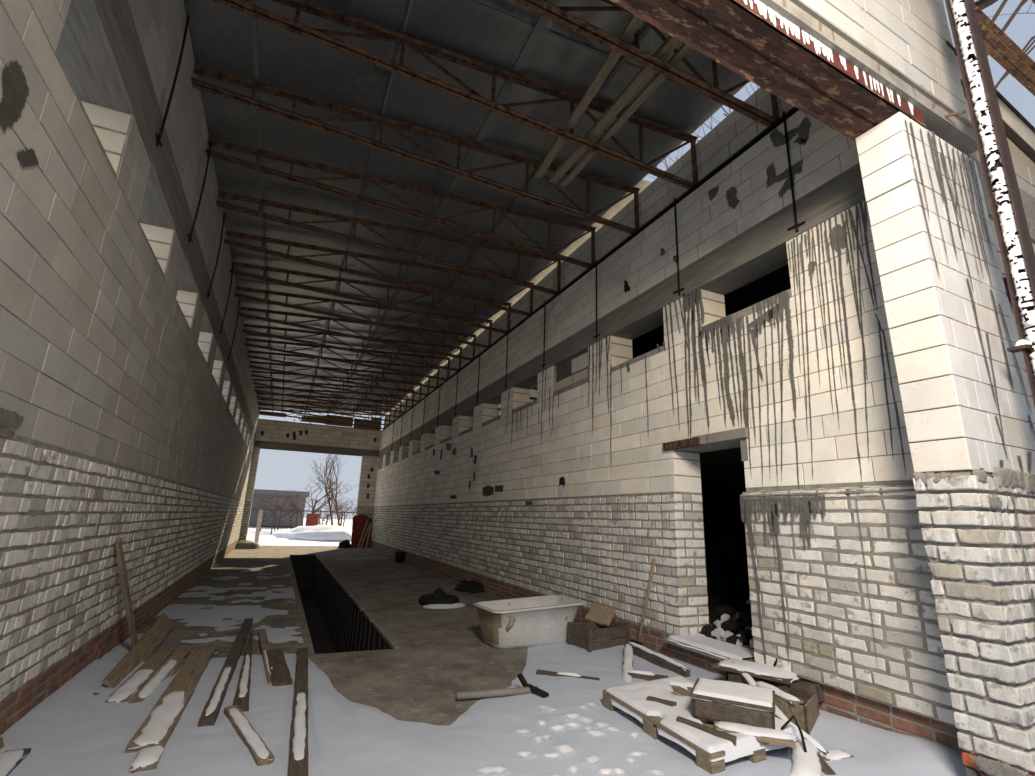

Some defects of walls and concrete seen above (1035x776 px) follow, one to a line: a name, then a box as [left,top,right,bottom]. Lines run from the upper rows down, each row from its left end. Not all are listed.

damp [588,335,630,451]
damp [656,201,906,664]
damp [744,0,1035,473]